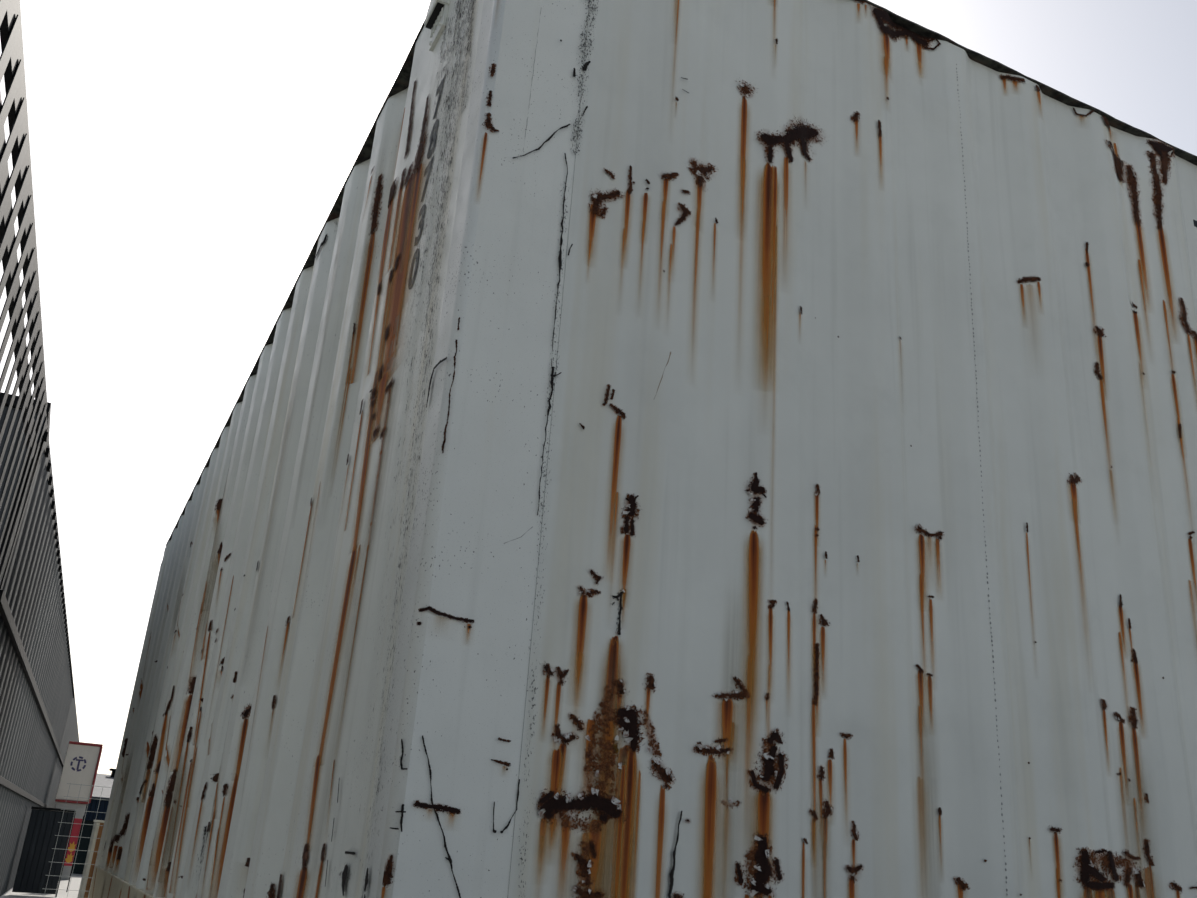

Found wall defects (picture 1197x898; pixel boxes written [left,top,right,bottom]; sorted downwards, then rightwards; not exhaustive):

rust [588,159,716,299]
rust [736,80,824,350]
rust [1073,107,1197,479]
rust [92,542,268,898]
rust [296,80,429,898]
crack [422,736,461,898]
rust [537,570,684,898]
rust [602,384,640,594]
rust [685,473,790,898]
rust [802,484,853,898]
rust [914,523,944,651]
rust [1067,472,1084,580]